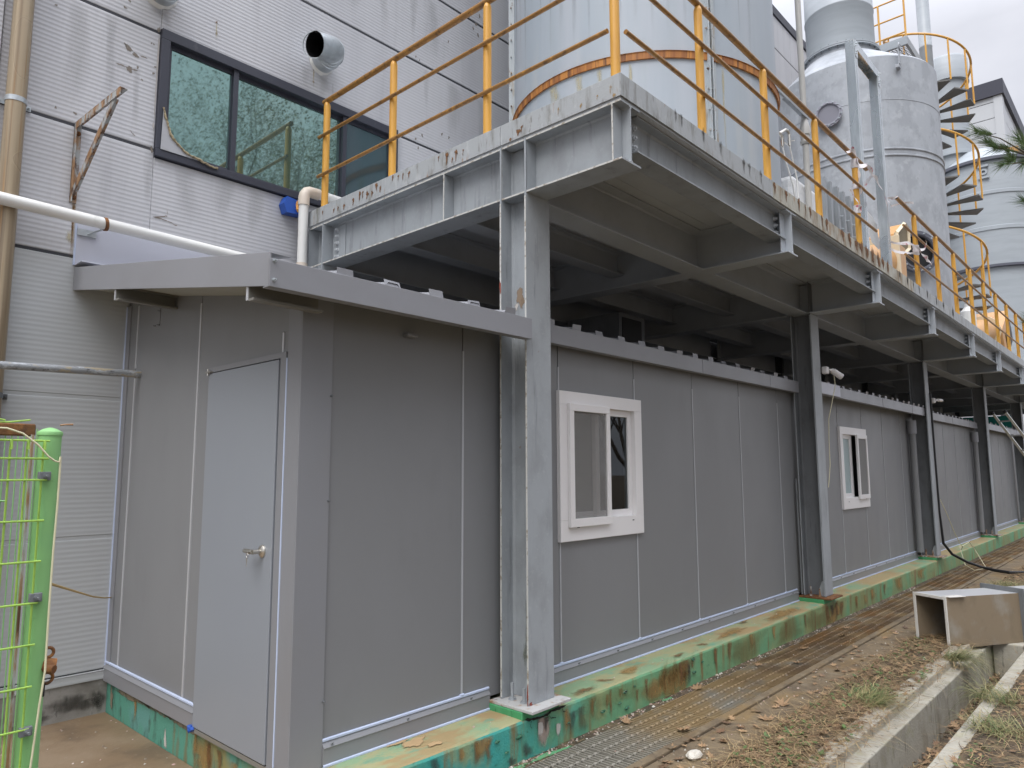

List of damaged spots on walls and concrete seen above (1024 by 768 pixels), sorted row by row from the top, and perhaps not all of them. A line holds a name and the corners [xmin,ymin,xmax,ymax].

rust [760,172,828,230]
rust [841,230,914,287]
rust [698,621,754,665]
rust [578,666,636,714]
rust [636,653,693,699]
rust [460,737,490,761]